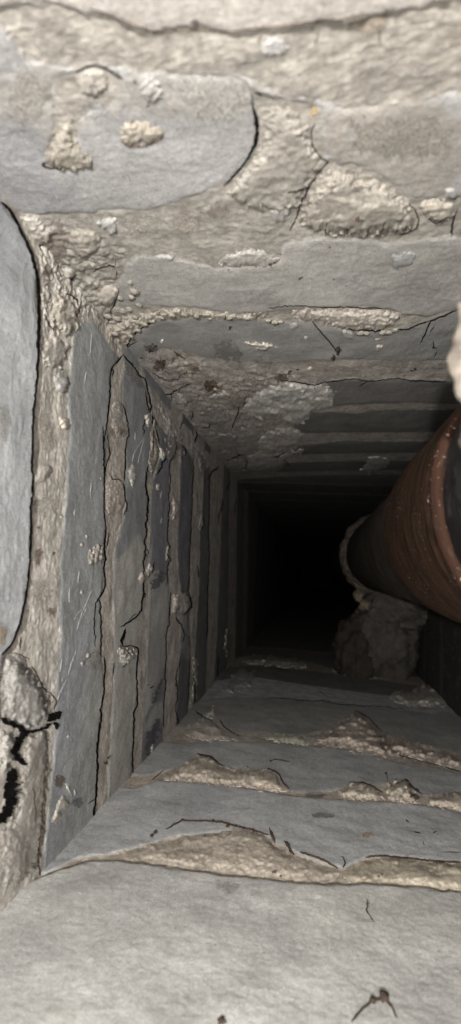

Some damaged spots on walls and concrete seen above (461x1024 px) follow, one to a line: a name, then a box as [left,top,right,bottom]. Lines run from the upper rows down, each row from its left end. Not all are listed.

crack [288,123,329,232]
crack [88,320,248,816]